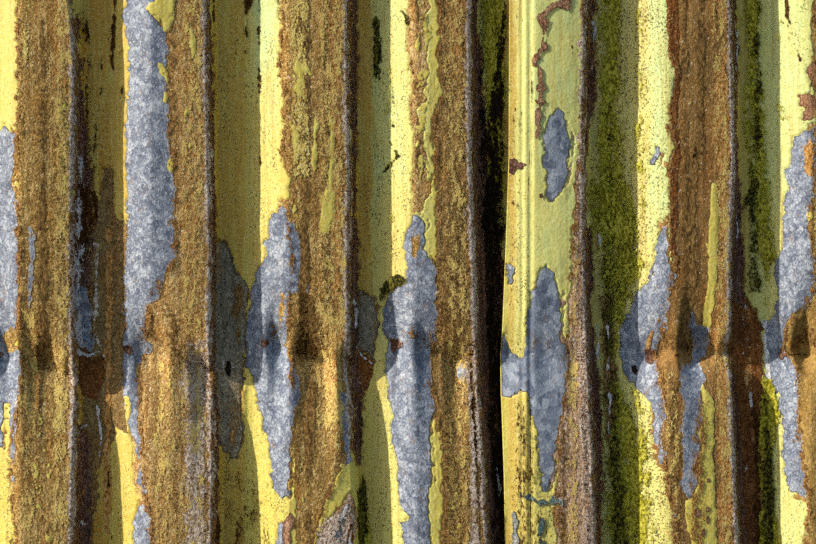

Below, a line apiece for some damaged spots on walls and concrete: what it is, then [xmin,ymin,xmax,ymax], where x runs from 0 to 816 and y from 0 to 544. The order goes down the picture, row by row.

peeling [0,123,23,447]
rust [2,0,96,544]
peeling [73,0,177,534]
rust [130,0,222,544]
peeling [213,205,309,498]
rust [274,0,366,544]
peeling [352,0,439,544]
rust [427,0,505,544]
peeling [501,264,568,492]
rust [548,0,606,544]
rust [650,0,766,544]
peeling [761,126,816,500]